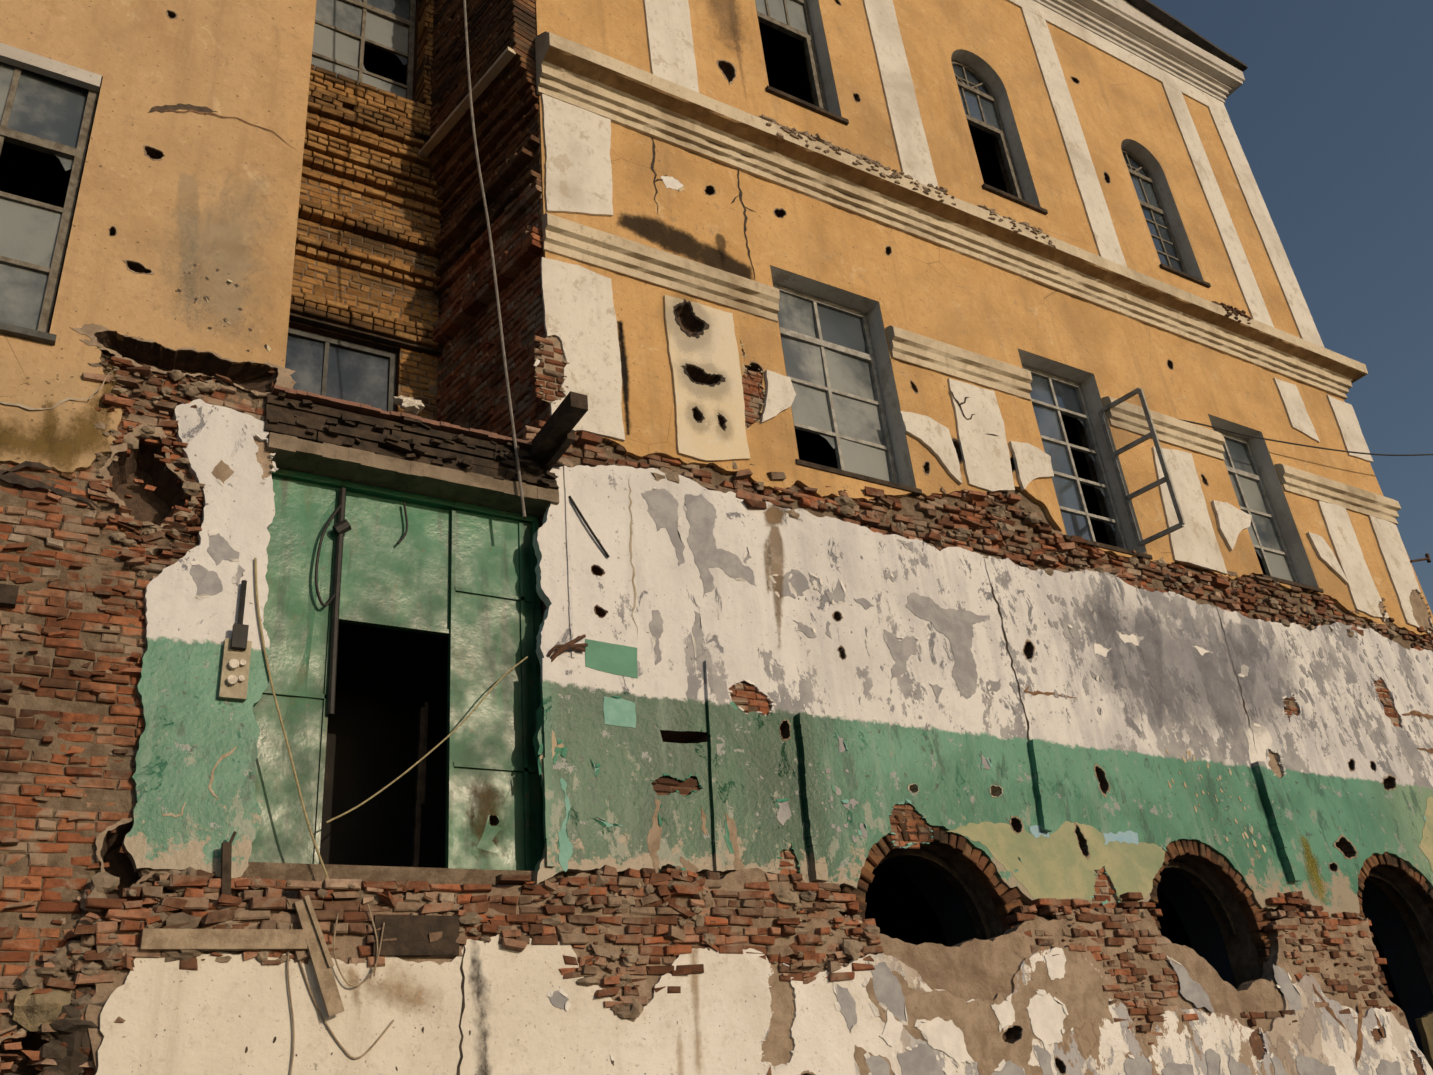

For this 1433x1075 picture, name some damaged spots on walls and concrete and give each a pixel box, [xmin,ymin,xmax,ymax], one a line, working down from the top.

crack [155,109,294,148]
crack [651,137,667,211]
spalling [749,113,956,206]
crack [731,170,755,277]
spalling [977,205,1056,248]
spalling [175,264,249,303]
spalling [1212,301,1252,324]
crack [984,559,1077,741]
flaking render [0,323,1433,1075]
crack [456,945,466,1075]